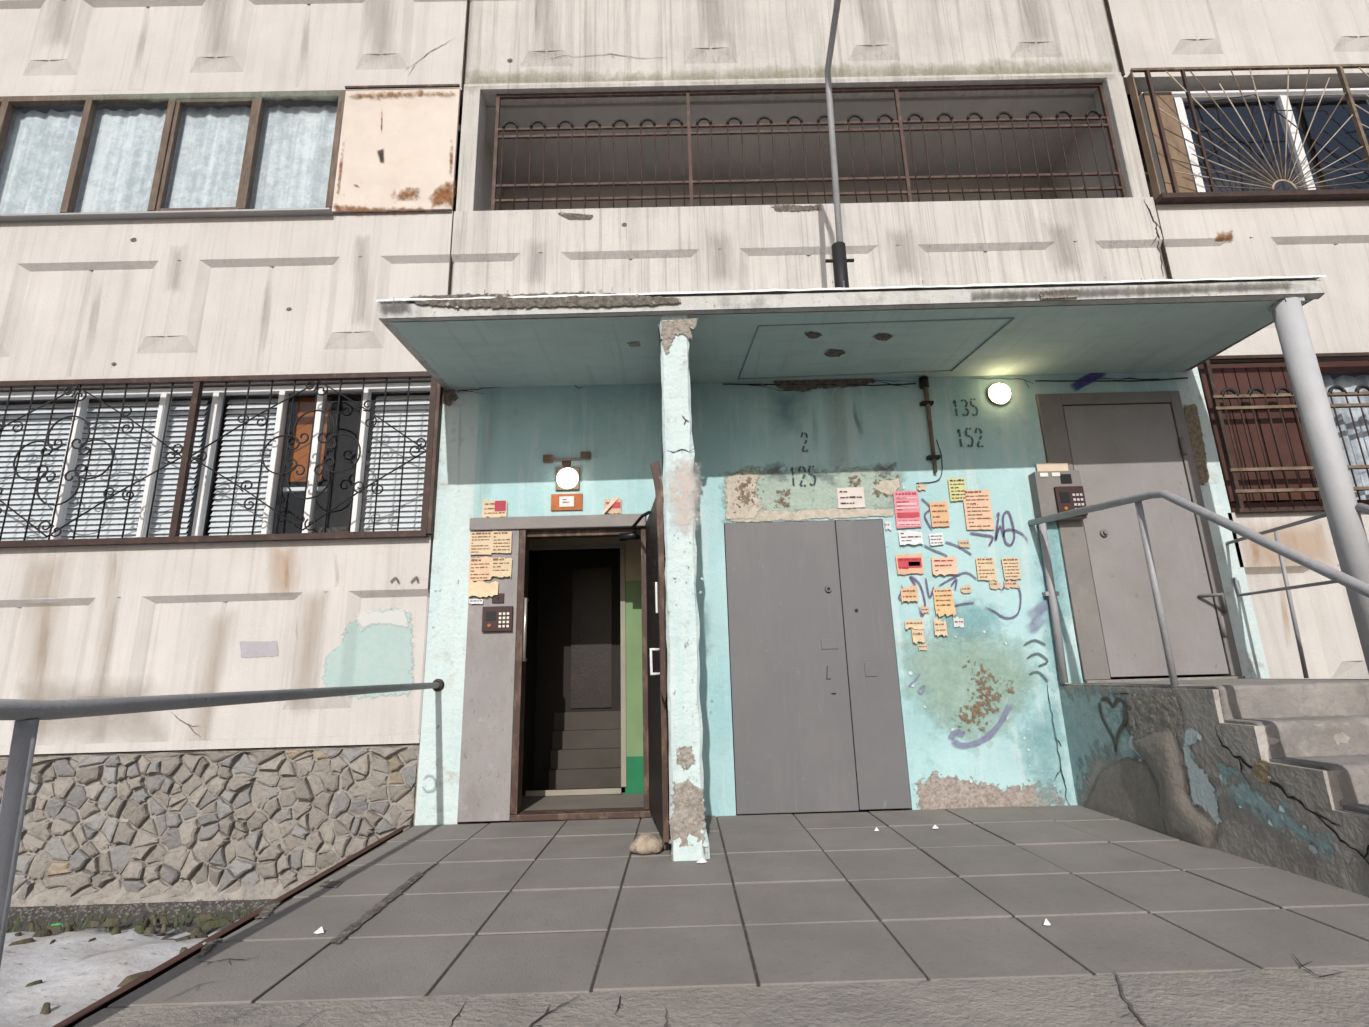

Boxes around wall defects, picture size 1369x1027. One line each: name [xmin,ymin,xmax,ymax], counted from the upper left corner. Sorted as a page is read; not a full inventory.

rust [356,90,453,130]
rust [334,183,454,214]
spalling [410,289,698,354]
spalling [442,389,458,406]
peeling [661,434,703,594]
peeling [724,464,905,523]
peeling [322,607,414,699]
spalling [668,746,708,859]
peeling [914,683,1333,859]
crack [1215,726,1369,864]
crack [529,995,579,1027]